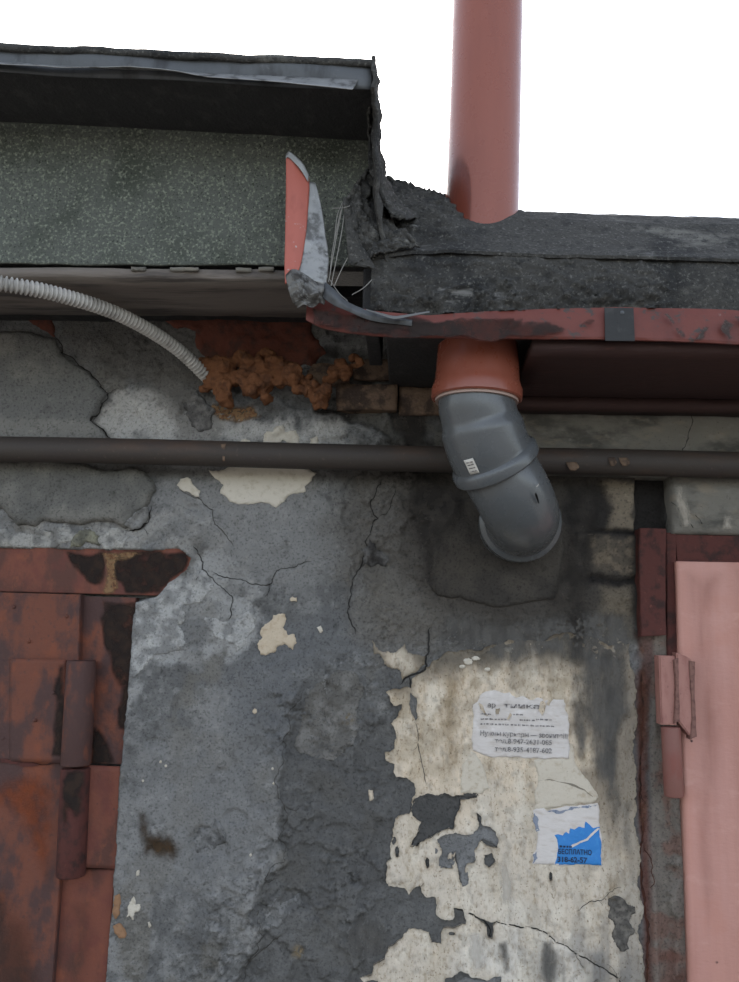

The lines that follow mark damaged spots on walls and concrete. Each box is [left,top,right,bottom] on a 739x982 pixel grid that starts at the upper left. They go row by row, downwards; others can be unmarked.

spalling [183,390,216,432]
peeling [263,425,319,444]
peeling [177,477,200,497]
crack [180,489,233,545]
peeling [209,467,316,508]
crack [193,546,311,619]
crack [347,481,396,632]
rust [68,551,188,728]
rust [92,729,112,764]
peeling [360,632,645,982]
crack [578,674,655,982]
crack [454,908,621,982]